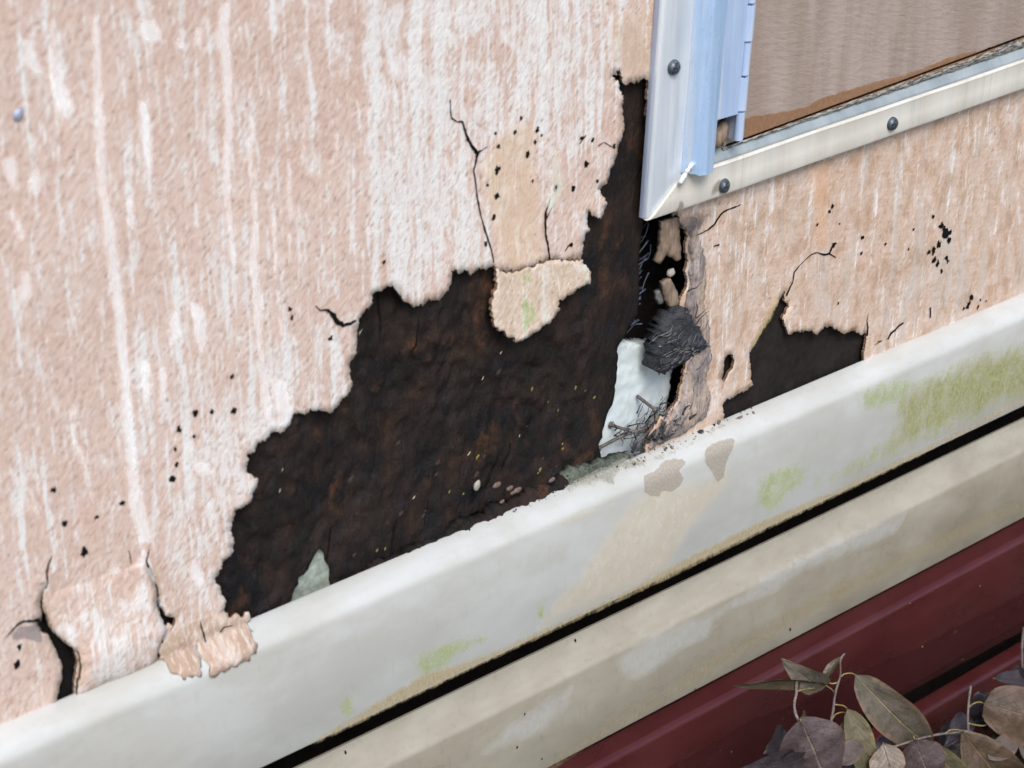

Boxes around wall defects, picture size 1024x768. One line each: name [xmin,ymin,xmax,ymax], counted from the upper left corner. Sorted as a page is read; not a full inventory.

crack [450,99,494,263]
crack [544,198,572,260]
crack [698,204,741,247]
crack [786,242,837,296]
crack [316,306,357,327]
peeling [489,258,591,343]
crack [44,556,52,589]
crack [6,617,76,700]